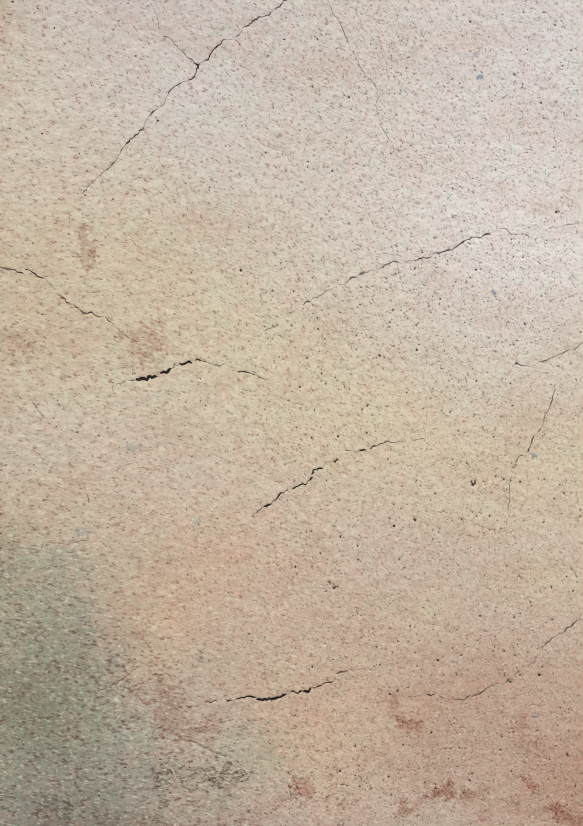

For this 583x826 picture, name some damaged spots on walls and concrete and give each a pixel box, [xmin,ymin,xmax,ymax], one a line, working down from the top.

crack [83,0,286,193]
crack [0,267,129,338]
crack [265,223,529,331]
crack [112,359,266,389]
crack [239,438,423,526]
crack [206,668,364,703]
crack [403,615,581,700]